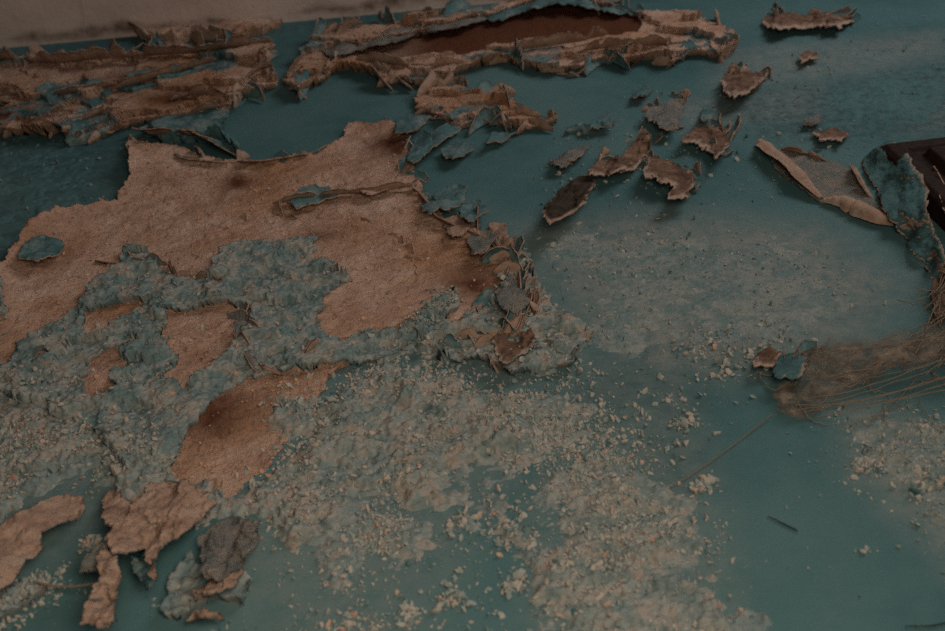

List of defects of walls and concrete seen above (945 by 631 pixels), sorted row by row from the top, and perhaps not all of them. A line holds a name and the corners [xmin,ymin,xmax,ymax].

peeling [749,1,861,36]
peeling [717,61,773,102]
peeling [439,142,476,160]
peeling [542,83,742,225]
peeling [756,110,945,279]
peeling [752,340,818,381]
spalling [314,604,391,631]